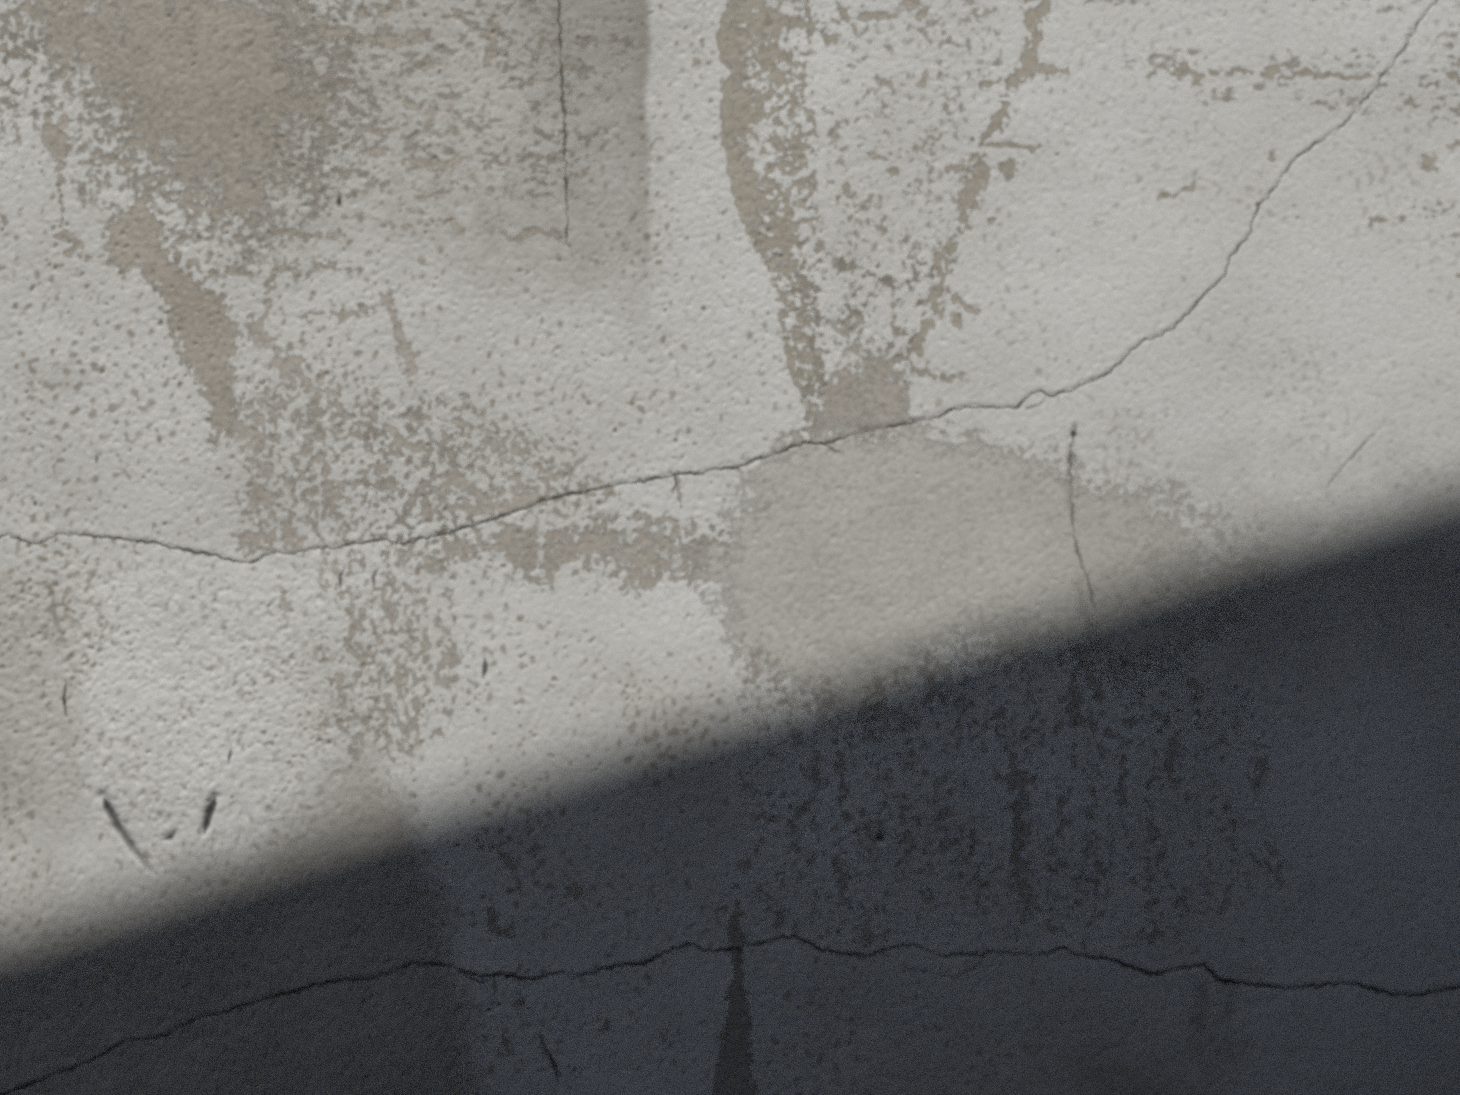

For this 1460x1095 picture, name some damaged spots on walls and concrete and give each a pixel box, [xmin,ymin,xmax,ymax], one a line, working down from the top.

spalling [1146,34,1460,113]
crack [0,2,1436,564]
spalling [1369,202,1459,226]
spalling [1422,140,1460,172]
peeling [0,0,1270,922]
peeling [757,791,897,948]
crack [0,935,1460,1095]
peeling [713,884,757,1095]